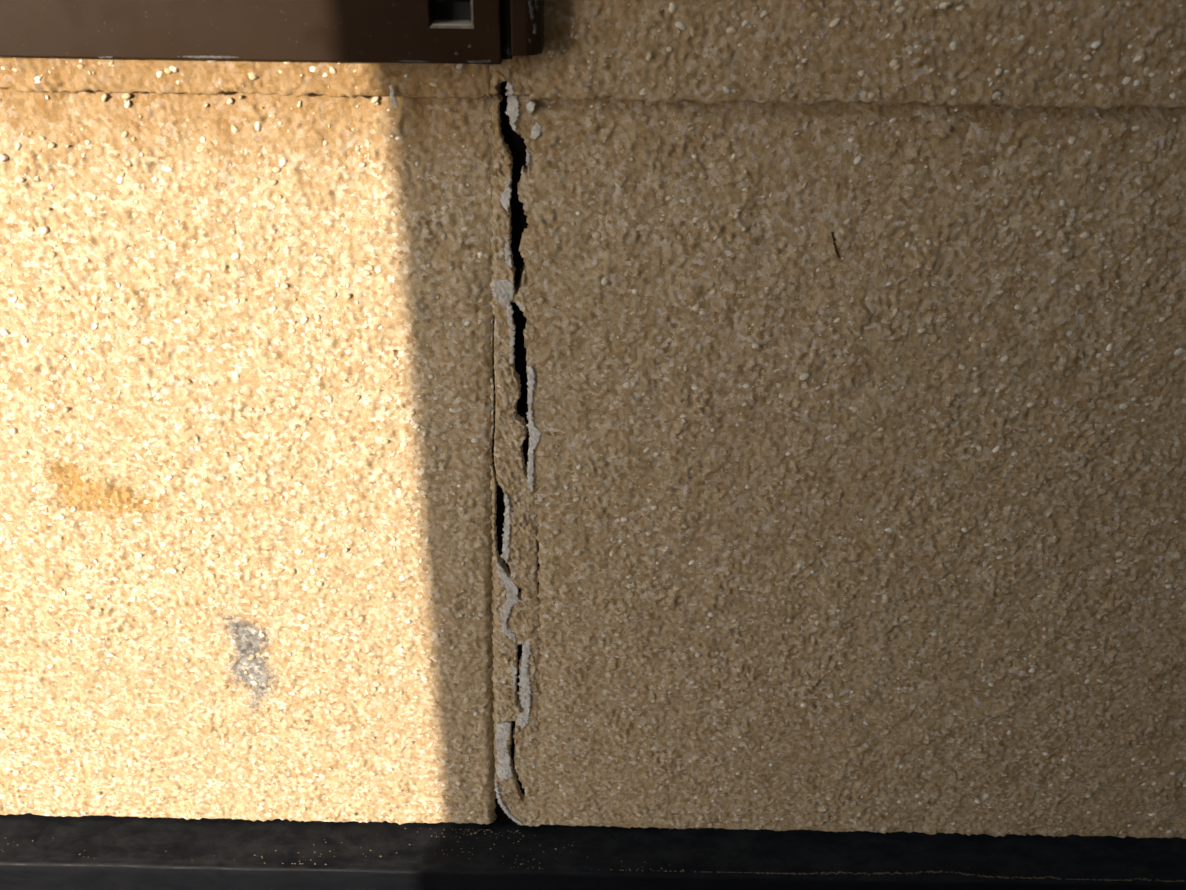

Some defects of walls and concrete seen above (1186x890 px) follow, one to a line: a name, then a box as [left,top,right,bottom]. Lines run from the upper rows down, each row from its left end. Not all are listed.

crack [491,81,542,825]